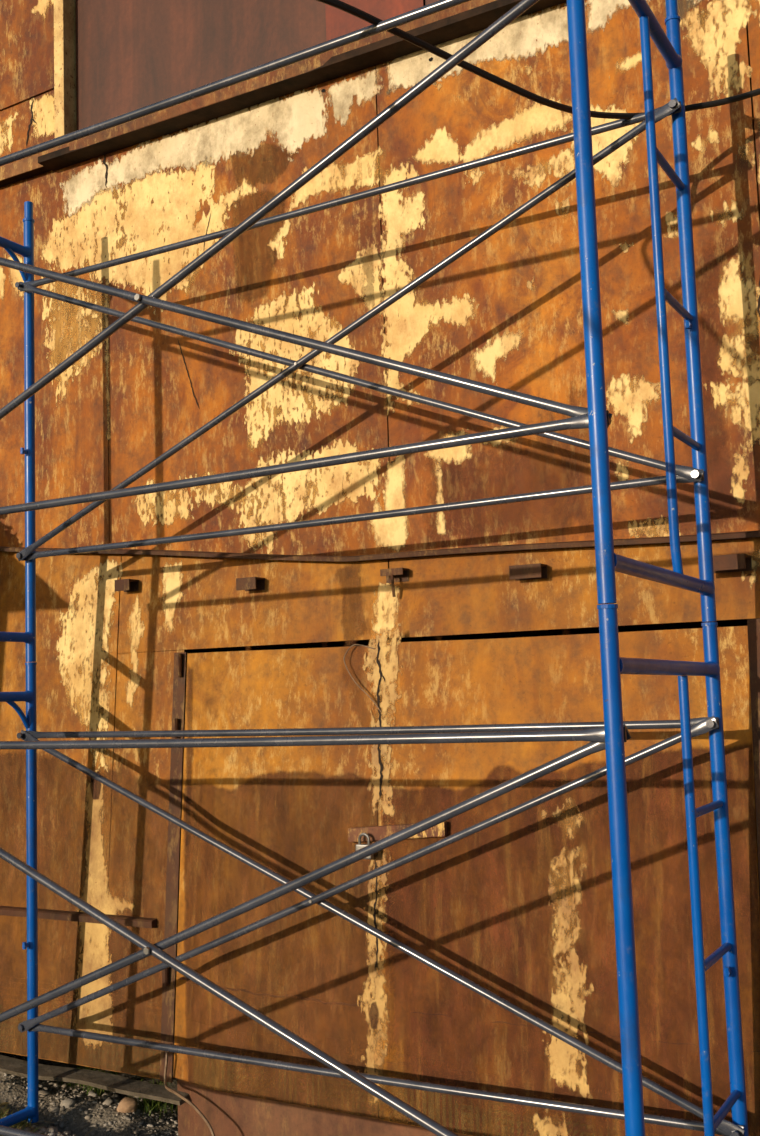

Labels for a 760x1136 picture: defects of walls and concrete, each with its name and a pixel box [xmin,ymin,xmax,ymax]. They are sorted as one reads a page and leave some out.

corrosion [232,145,284,301]
peeling [41,3,576,440]
peeling [590,104,641,187]
peeling [680,0,760,100]
peeling [131,282,408,554]
peeling [705,251,760,503]
peeling [56,559,134,1049]
corrosion [90,772,101,799]
crack [376,642,385,800]
peeling [363,582,402,818]
corrosion [369,1002,379,1029]
peeling [542,798,594,1098]